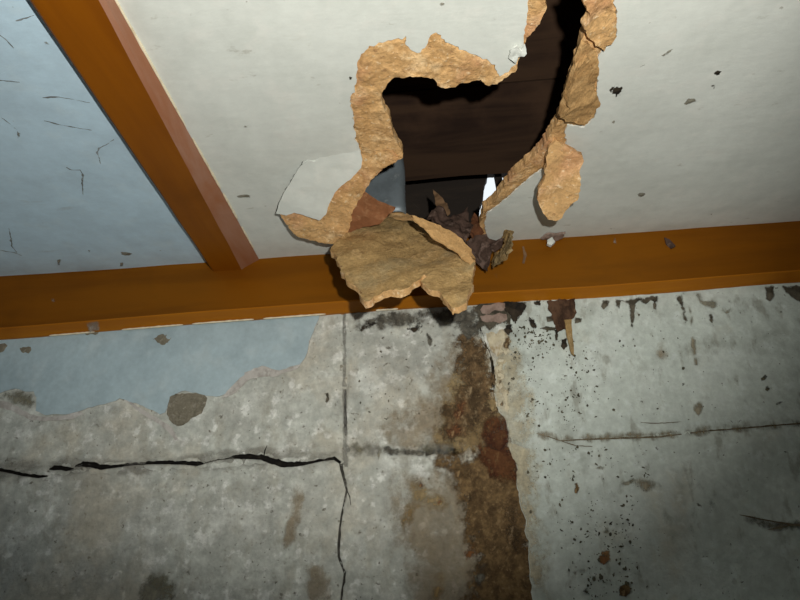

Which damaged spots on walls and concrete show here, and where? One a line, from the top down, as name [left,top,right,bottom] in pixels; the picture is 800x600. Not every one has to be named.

flaking render [541,232,565,241]
damp [601,296,658,327]
damp [696,294,716,323]
damp [765,285,800,301]
peeling [0,315,320,440]
crack [0,314,351,600]
corrosion [353,333,532,600]
damp [357,301,619,584]
peeling [480,283,800,600]